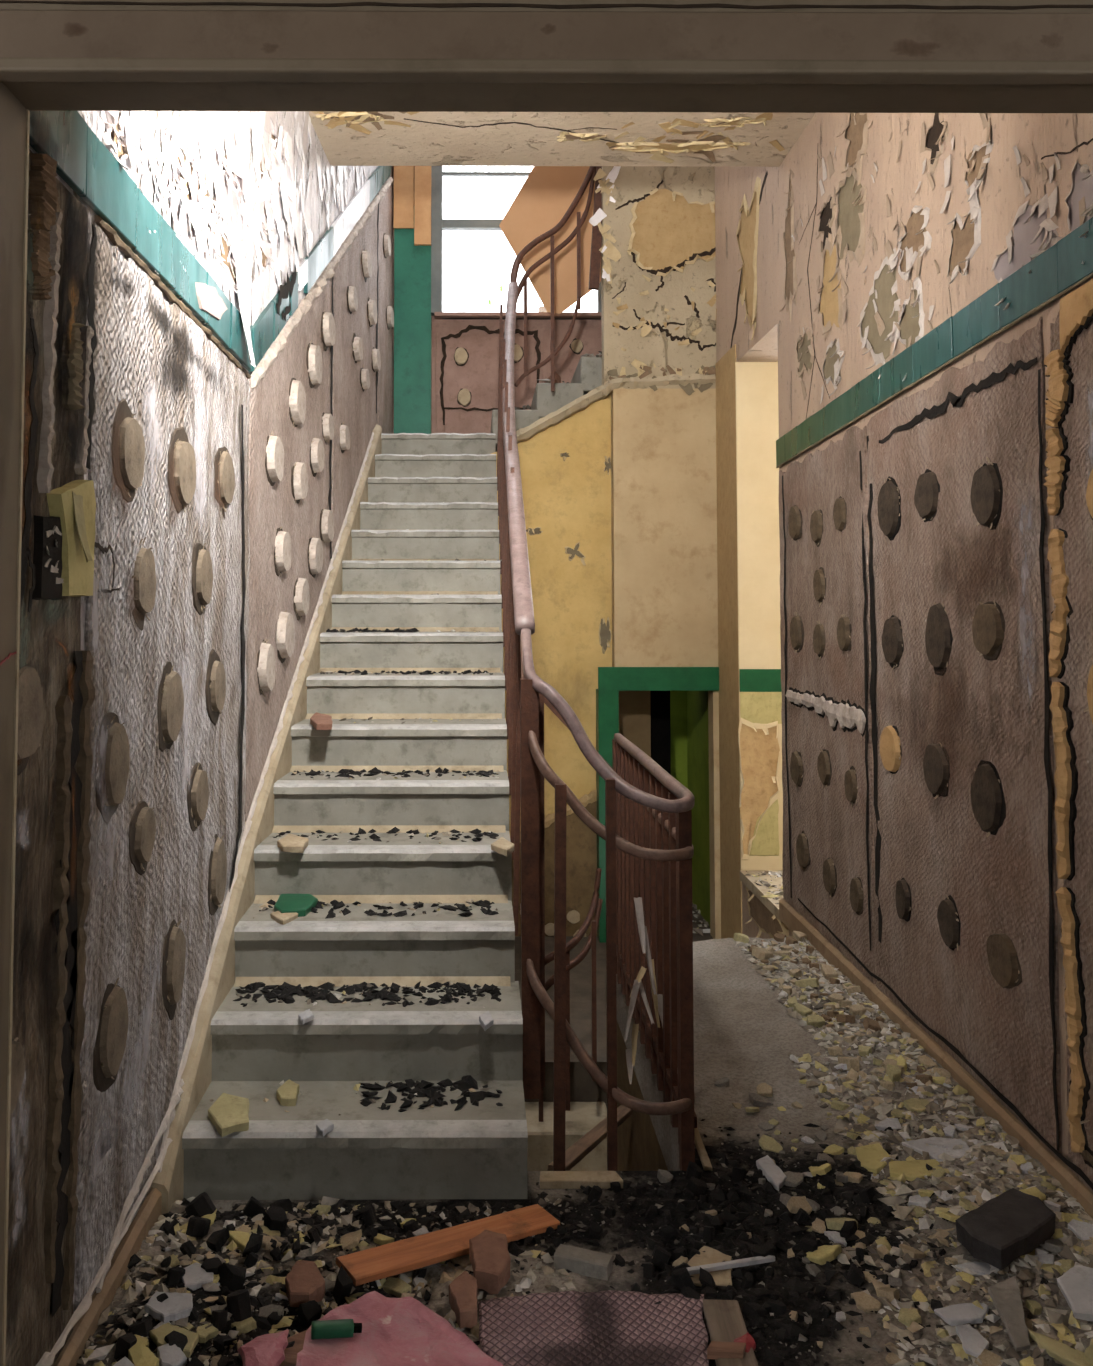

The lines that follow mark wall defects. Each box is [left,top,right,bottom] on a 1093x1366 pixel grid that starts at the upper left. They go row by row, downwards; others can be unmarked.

crack [0,0,1093,10]
peeling [100,111,419,326]
crack [404,118,619,143]
flaking render [557,113,785,346]
peeling [779,113,994,404]
peeling [991,145,1093,310]
flaking render [607,347,716,395]
crack [782,357,1093,1190]